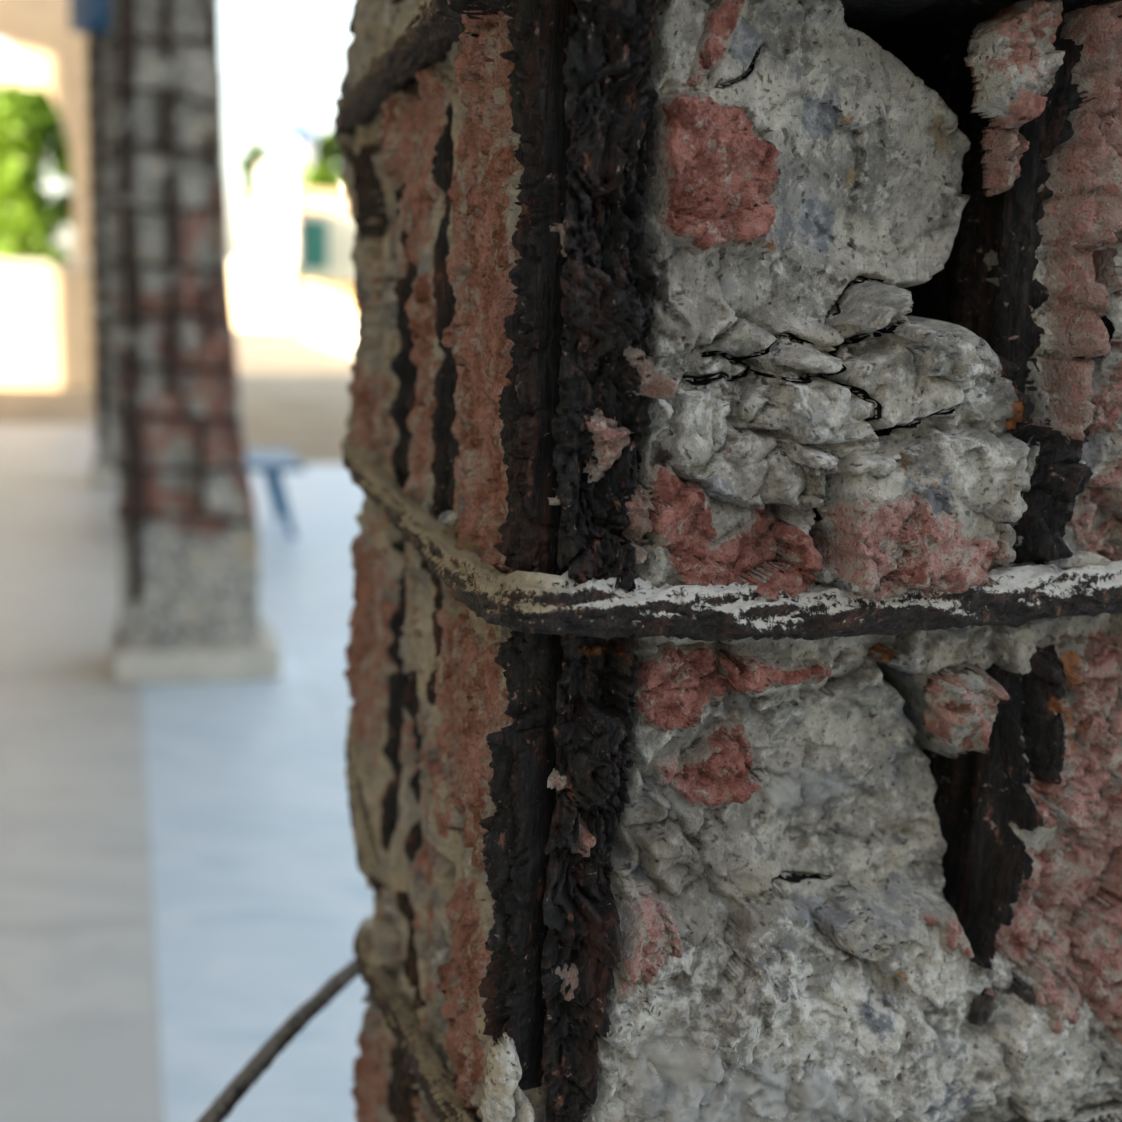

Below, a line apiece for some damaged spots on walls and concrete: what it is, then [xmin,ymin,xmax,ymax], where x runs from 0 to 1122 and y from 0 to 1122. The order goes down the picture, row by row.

spalling [88,30,106,442]
spalling [119,0,136,107]
spalling [120,128,144,602]
spalling [345,0,1122,602]
crack [682,276,960,436]
corrosion [903,253,955,323]
corrosion [840,0,1020,129]
corrosion [973,193,1050,448]
corrosion [1035,0,1090,238]
spalling [343,532,1122,1122]
corrosion [941,669,1044,970]
corrosion [967,971,1037,1026]